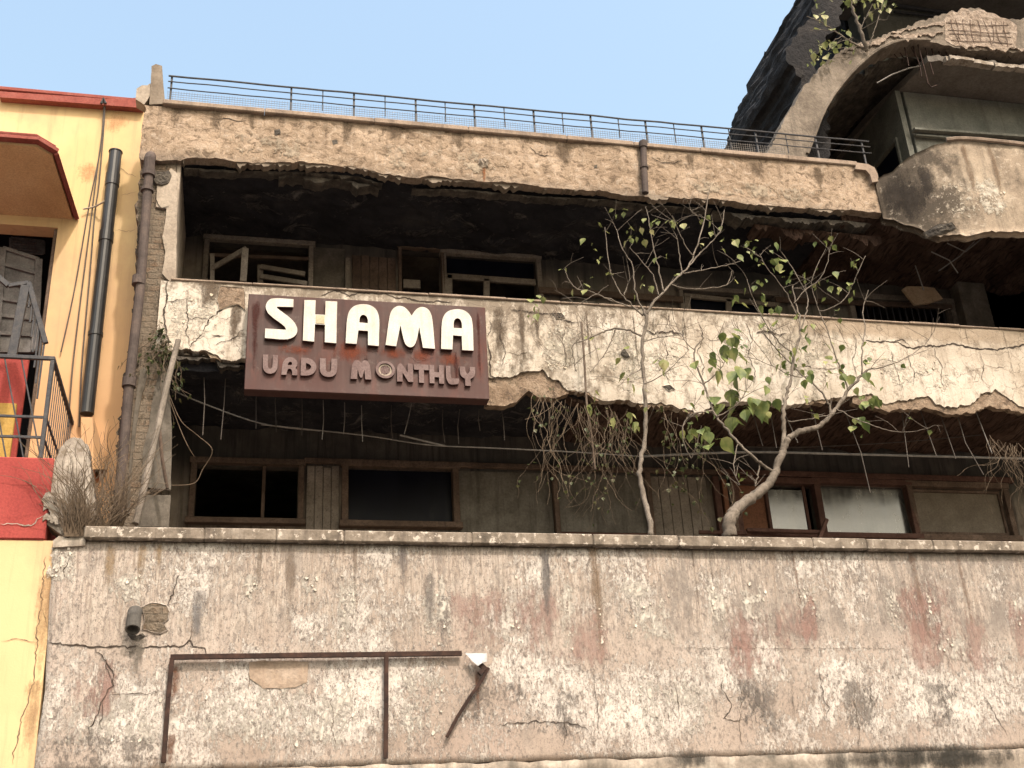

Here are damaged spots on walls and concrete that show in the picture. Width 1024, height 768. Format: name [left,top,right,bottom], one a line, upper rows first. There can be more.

spalling [876,8,1024,88]
crack [163,282,243,348]
crack [805,332,1024,389]
flaking render [478,312,1024,493]
flaking render [108,573,170,642]
crack [7,557,206,761]
flaking render [177,660,376,759]